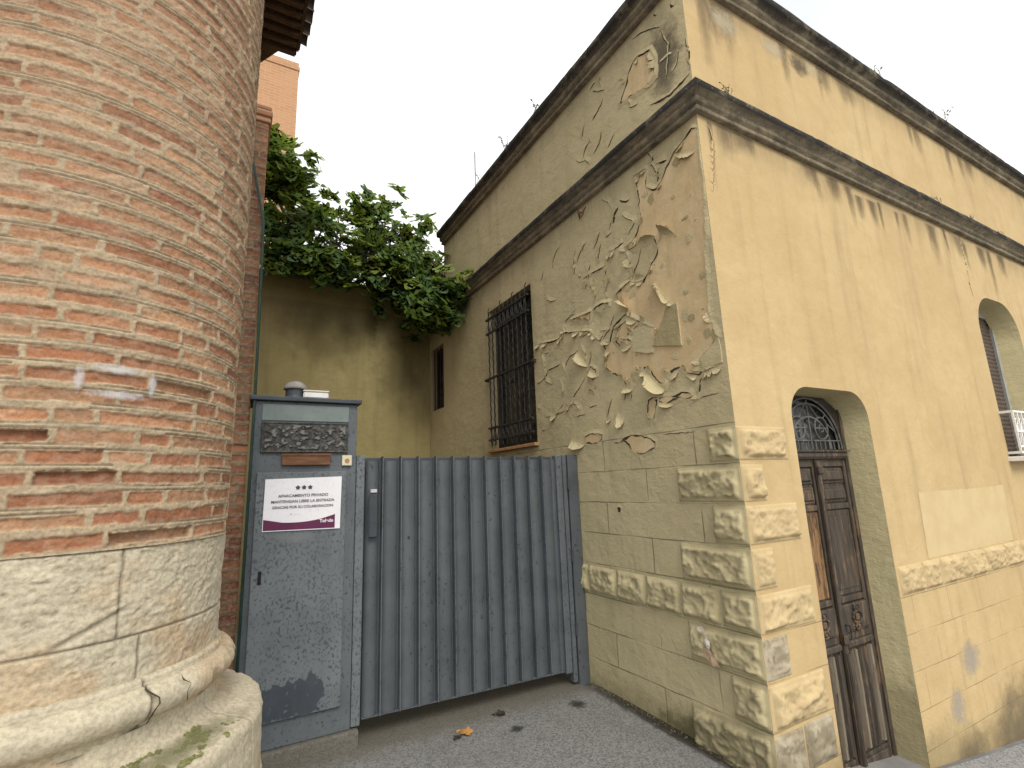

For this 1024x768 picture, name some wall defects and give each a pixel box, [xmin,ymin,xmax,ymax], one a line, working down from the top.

peeling [617,43,659,109]
peeling [534,123,723,457]
crack [144,685,161,724]